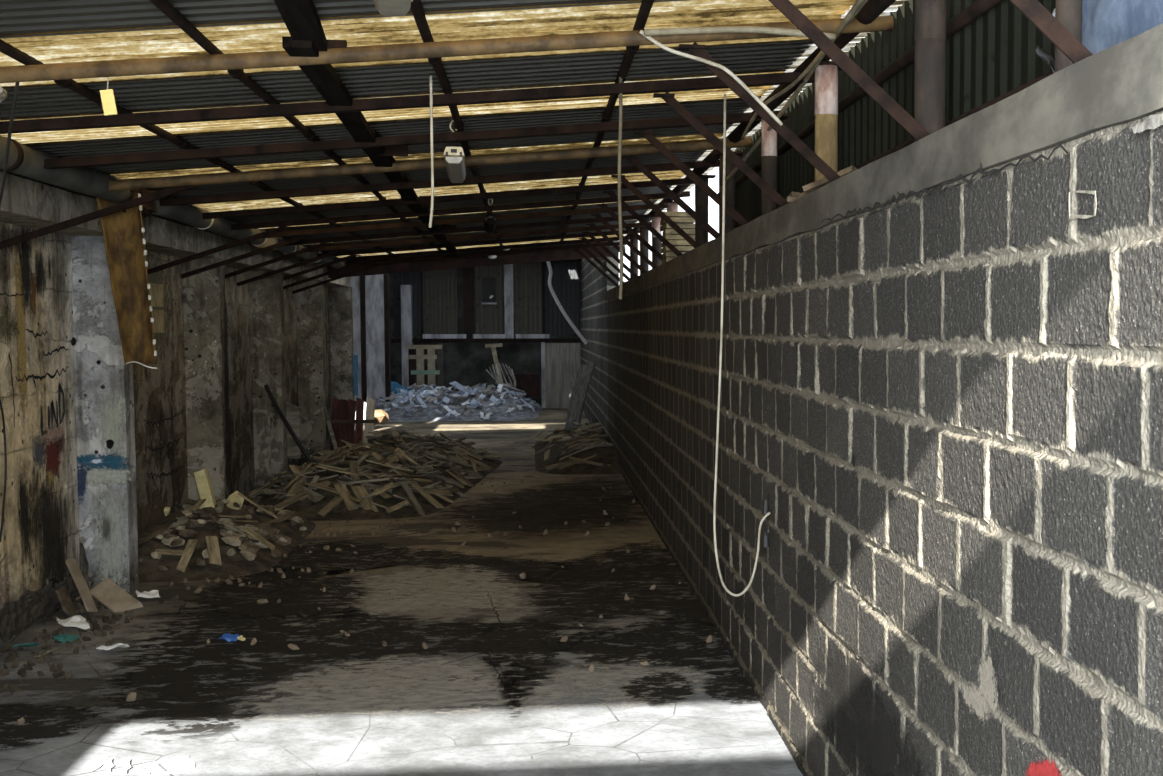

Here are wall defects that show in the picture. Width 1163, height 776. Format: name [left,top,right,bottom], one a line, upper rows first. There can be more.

leakage [18,469,71,588]
leakage [92,489,128,591]
leakage [440,476,649,536]
leakage [0,540,760,750]